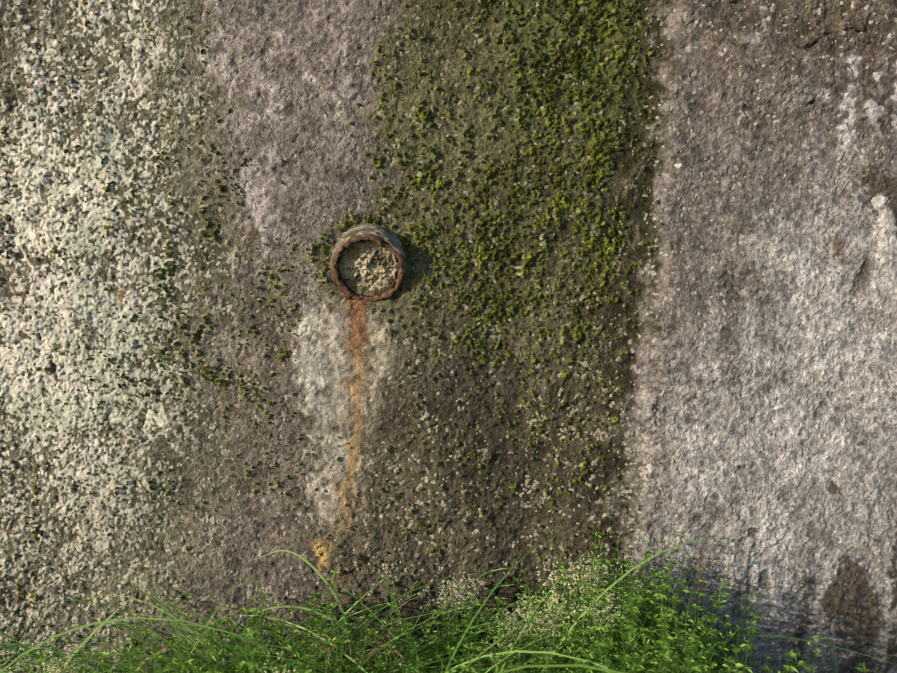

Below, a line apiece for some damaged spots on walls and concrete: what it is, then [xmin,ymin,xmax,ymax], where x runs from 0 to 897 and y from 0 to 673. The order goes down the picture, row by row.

water stain [292,297,394,543]
rust [338,292,365,522]
rust [313,540,329,572]
water stain [794,571,814,673]
water stain [820,522,897,673]